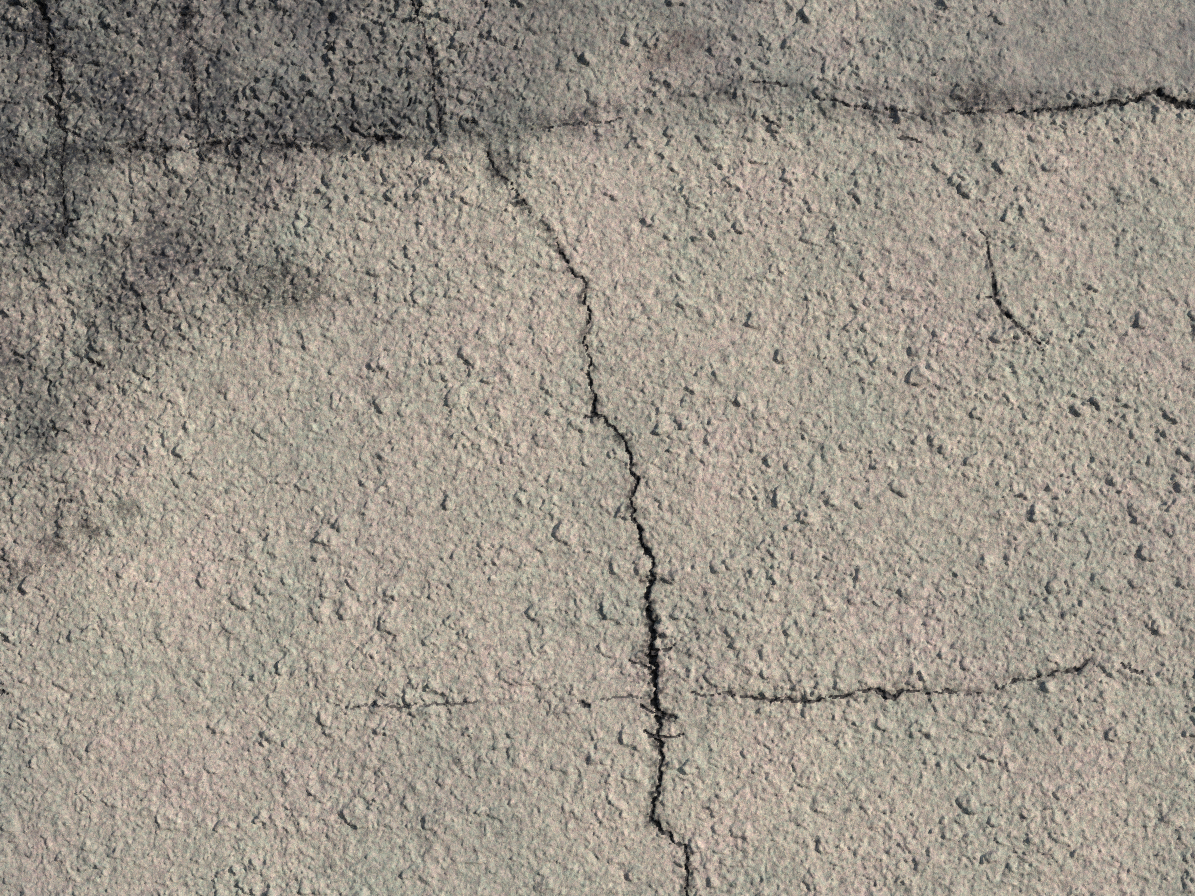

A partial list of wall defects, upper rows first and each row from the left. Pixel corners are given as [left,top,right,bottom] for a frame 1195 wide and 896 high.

crack [411,0,441,133]
crack [0,0,404,236]
water stain [0,0,419,253]
crack [530,117,622,131]
crack [748,80,1195,143]
water stain [90,189,206,323]
water stain [0,332,36,384]
water stain [18,395,62,453]
crack [481,133,1090,896]
crack [1120,662,1144,675]
crack [333,701,477,711]